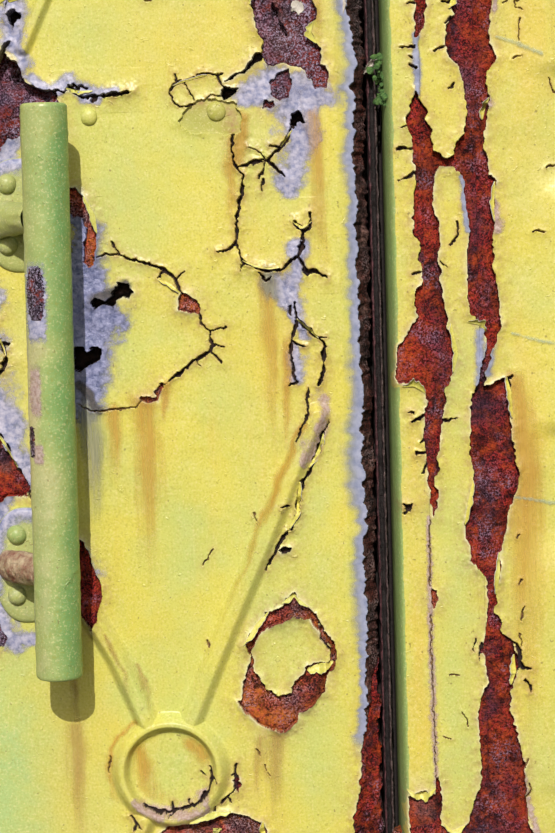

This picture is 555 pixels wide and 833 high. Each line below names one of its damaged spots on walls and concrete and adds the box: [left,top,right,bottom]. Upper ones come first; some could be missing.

corrosion [0,35,62,152]
corrosion [245,0,334,109]
peeling [0,370,44,489]
peeling [25,266,47,341]
peeling [70,214,138,423]
crack [97,241,184,294]
crack [217,125,328,282]
peeling [178,0,377,744]
crack [266,302,330,570]
corrosion [390,0,541,833]
crack [131,763,242,832]
corrosion [353,658,384,833]